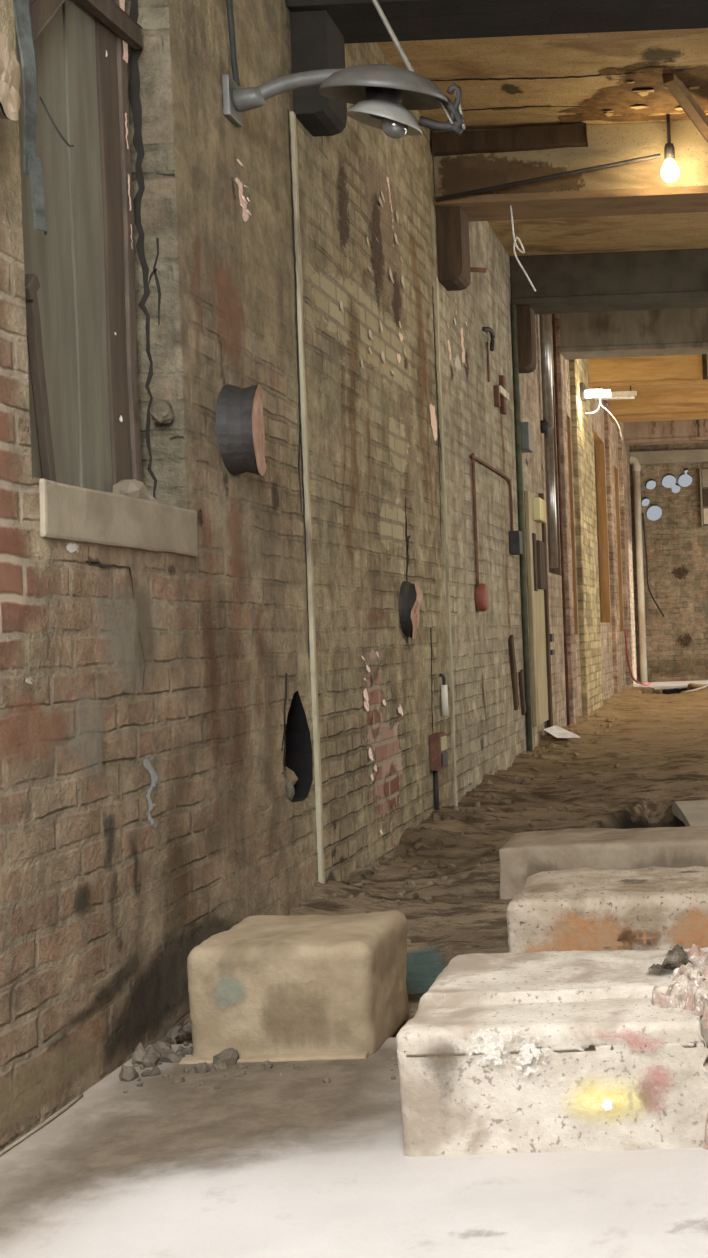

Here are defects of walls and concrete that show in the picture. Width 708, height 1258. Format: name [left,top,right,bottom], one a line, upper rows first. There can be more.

crack [128,0,184,499]
peeling [231,159,251,222]
peeling [362,648,404,852]
leakage [71,917,232,1060]